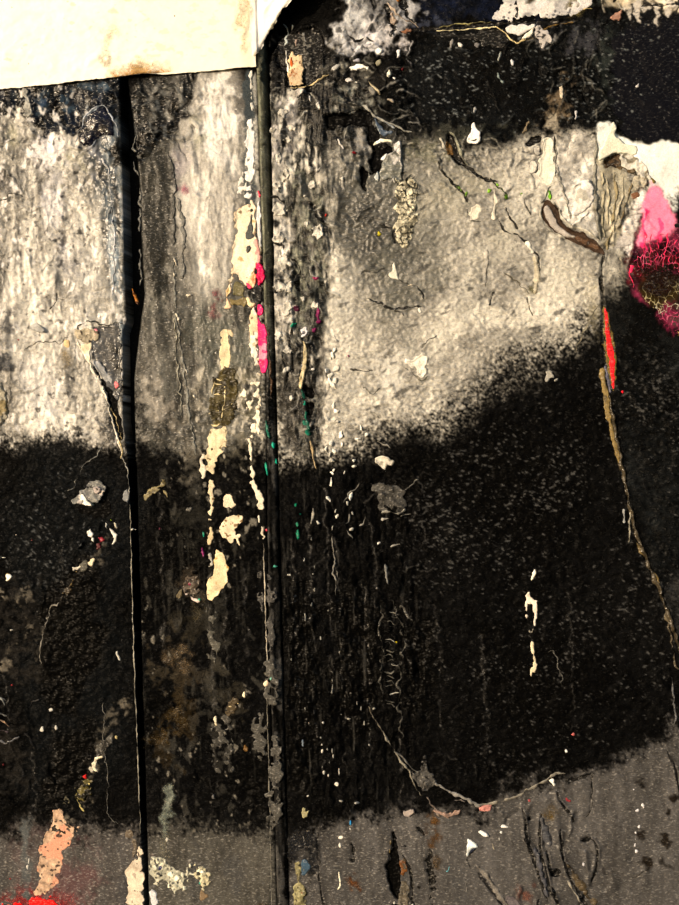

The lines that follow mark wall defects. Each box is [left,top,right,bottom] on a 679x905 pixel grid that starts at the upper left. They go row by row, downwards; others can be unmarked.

peeling [492,0,592,22]
corrosion [111,65,169,77]
peeling [219,329,234,370]
peeling [33,796,80,896]